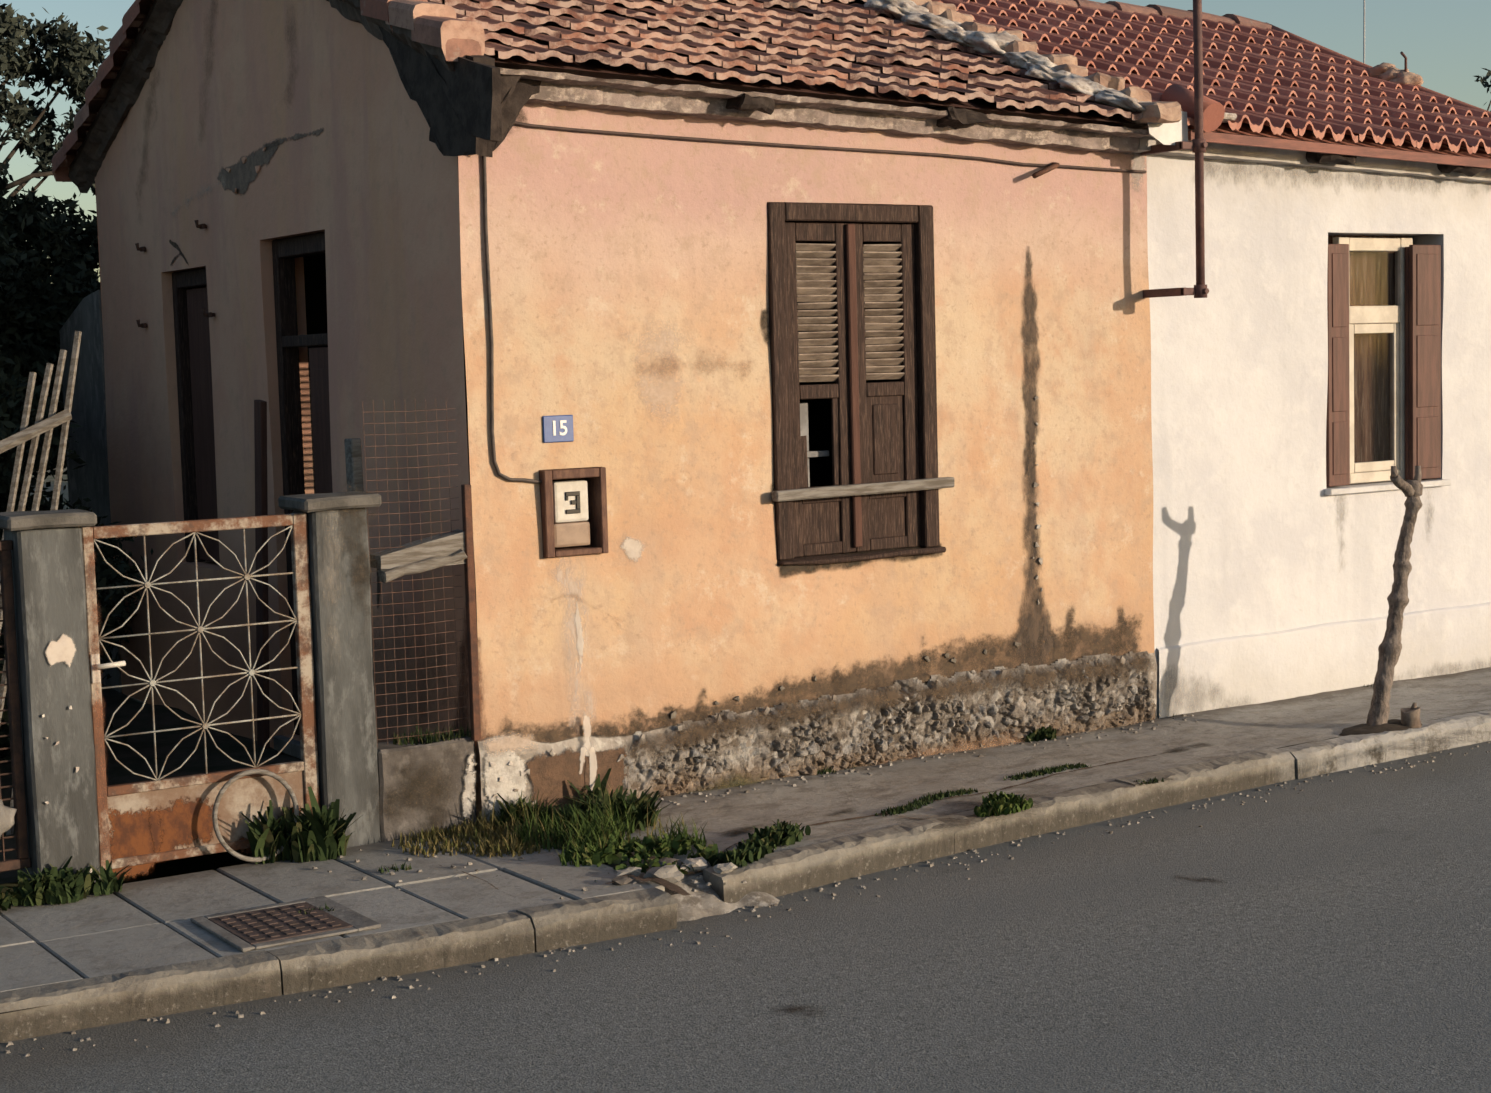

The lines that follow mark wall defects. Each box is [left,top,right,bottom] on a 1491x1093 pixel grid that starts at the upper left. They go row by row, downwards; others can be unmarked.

spalling [207,128,323,195]
leakage [487,251,1152,791]
peeling [46,634,76,667]
corrosion [89,552,219,878]
spalling [481,651,1156,822]